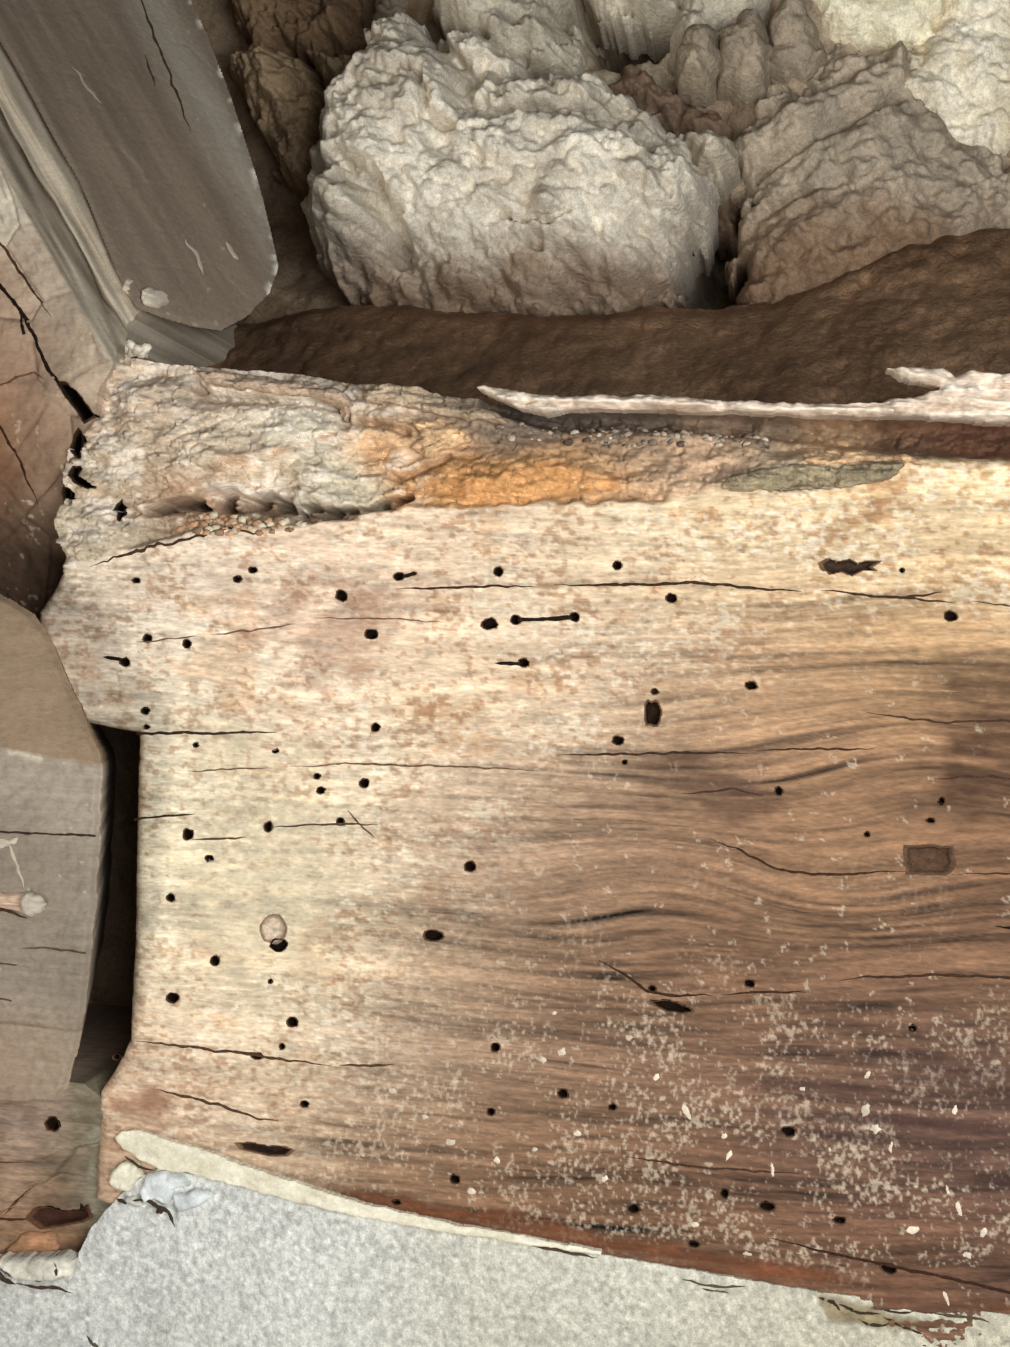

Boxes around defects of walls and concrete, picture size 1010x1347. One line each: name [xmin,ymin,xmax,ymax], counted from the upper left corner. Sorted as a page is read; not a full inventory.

crack [0,242,70,400]
crack [0,425,38,504]